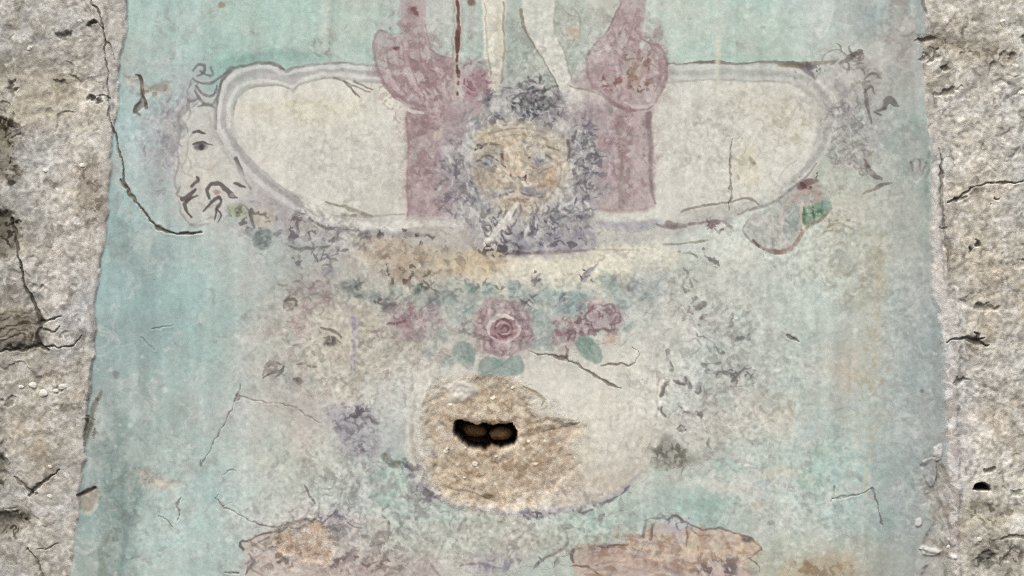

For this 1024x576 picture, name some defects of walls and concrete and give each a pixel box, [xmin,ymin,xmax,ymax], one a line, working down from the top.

crack [89,0,111,101]
crack [111,125,125,172]
crack [136,199,203,235]
crack [939,150,1024,269]
crack [0,251,82,353]
crack [533,347,640,389]
crack [200,384,322,528]
spalling [412,370,591,518]
crack [158,498,181,527]
crack [830,486,883,533]
spalling [272,515,339,567]